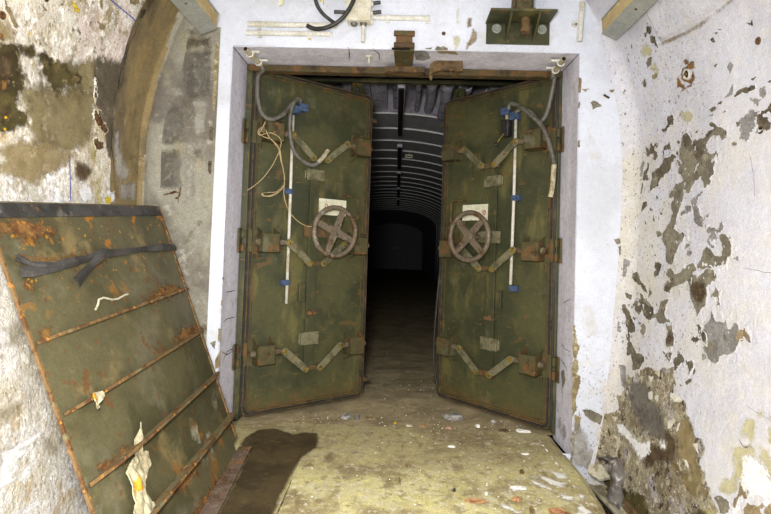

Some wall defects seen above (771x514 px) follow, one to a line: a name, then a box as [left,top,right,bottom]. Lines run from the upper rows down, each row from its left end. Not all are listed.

water stain [0,42,146,203]
spalling [92,77,109,151]
spalling [561,77,771,514]
water stain [219,429,318,514]